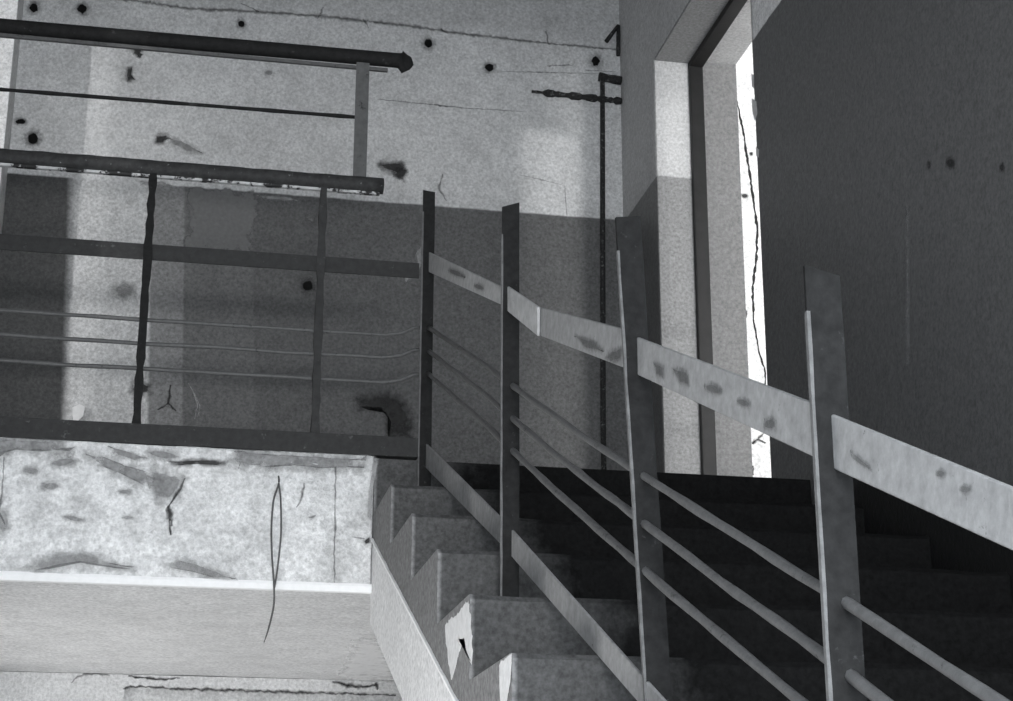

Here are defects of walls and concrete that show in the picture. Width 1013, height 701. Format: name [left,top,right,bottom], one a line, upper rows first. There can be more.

crack [124,0,616,74]
crack [166,478,185,535]